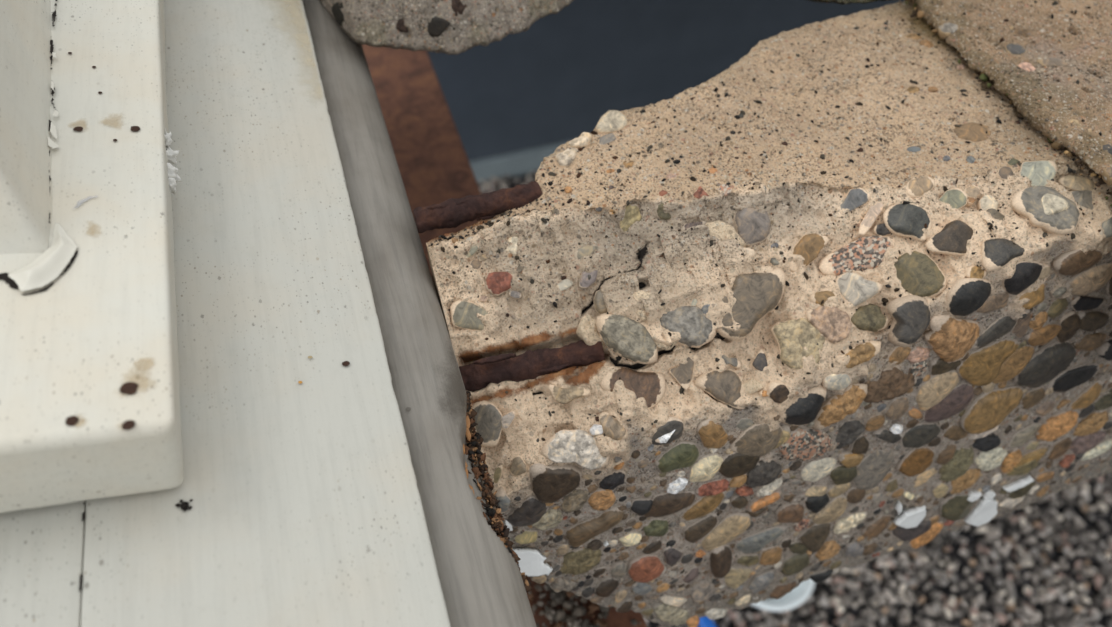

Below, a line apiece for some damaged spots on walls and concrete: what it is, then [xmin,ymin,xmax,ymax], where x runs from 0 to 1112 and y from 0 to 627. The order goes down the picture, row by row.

crack [899,0,1112,206]
peeling [8,223,78,295]
corrosion [459,328,577,364]
corrosion [471,354,609,404]
spalling [429,164,1112,467]
peeling [512,546,553,577]